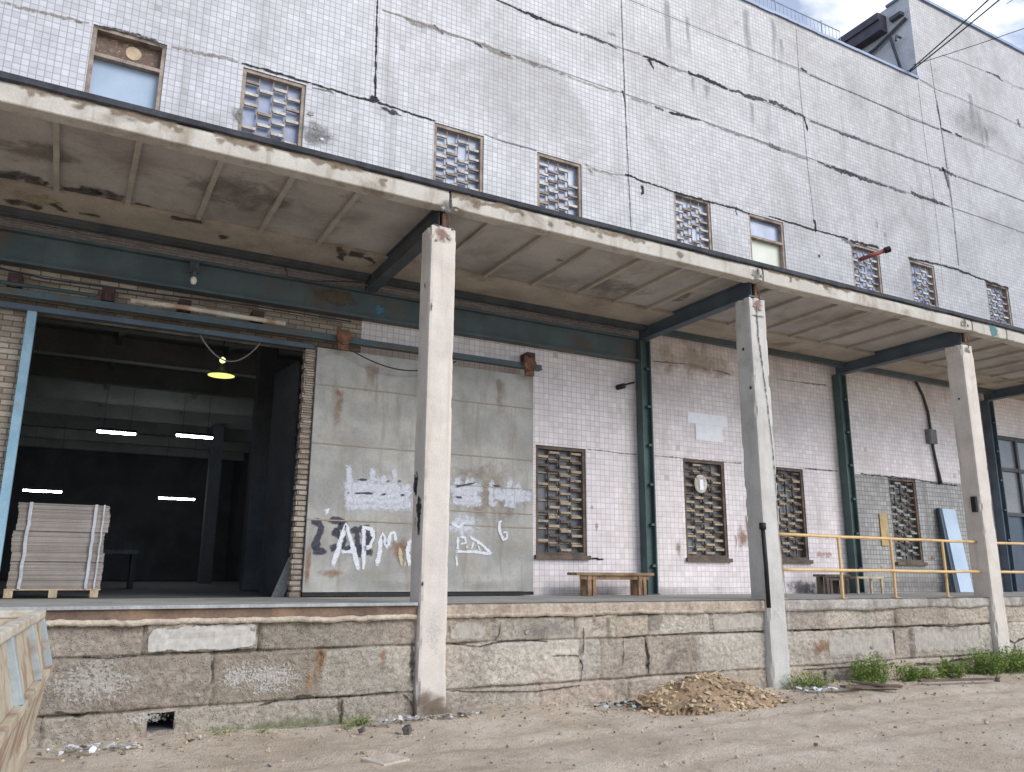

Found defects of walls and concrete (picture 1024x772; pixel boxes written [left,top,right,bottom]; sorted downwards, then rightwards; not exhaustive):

crack [8,3,435,122]
crack [384,0,957,207]
crack [945,56,1003,81]
leakage [0,172,67,212]
leakage [63,186,124,201]
crack [585,164,879,249]
leakage [337,247,375,264]
crack [453,611,764,693]